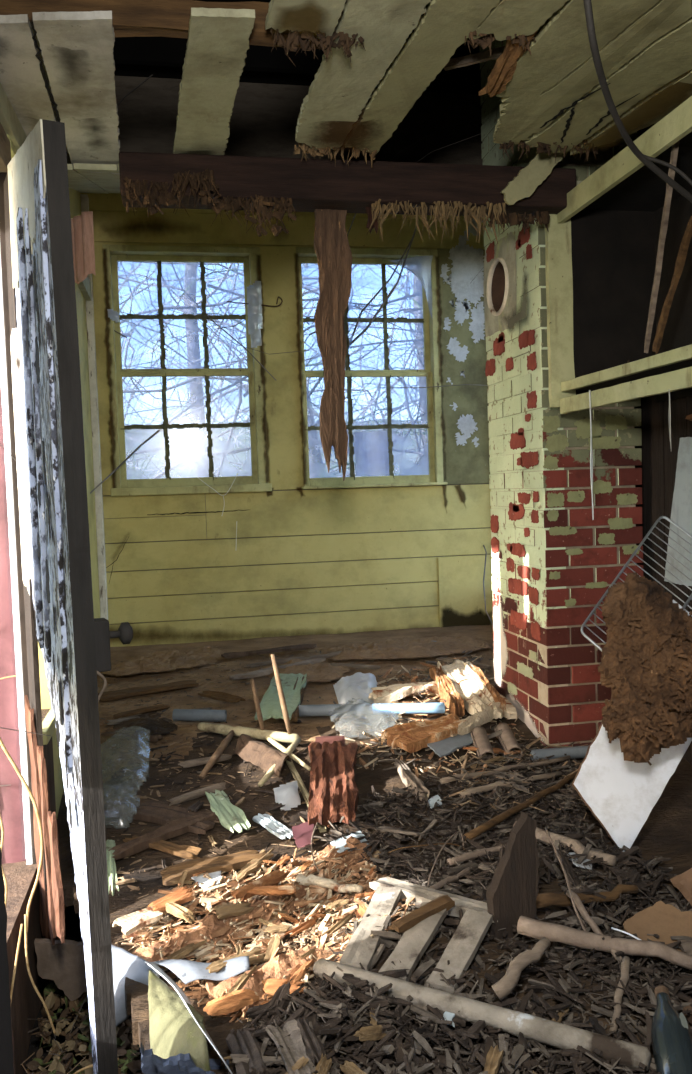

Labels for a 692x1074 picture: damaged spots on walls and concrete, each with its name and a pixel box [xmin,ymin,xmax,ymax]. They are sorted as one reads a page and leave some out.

water stain [279,4,324,34]
water stain [314,112,374,149]
crack [540,83,640,143]
peeling [450,402,479,447]
peeling [510,390,561,470]
peeling [574,414,628,450]
peeling [490,480,640,680]